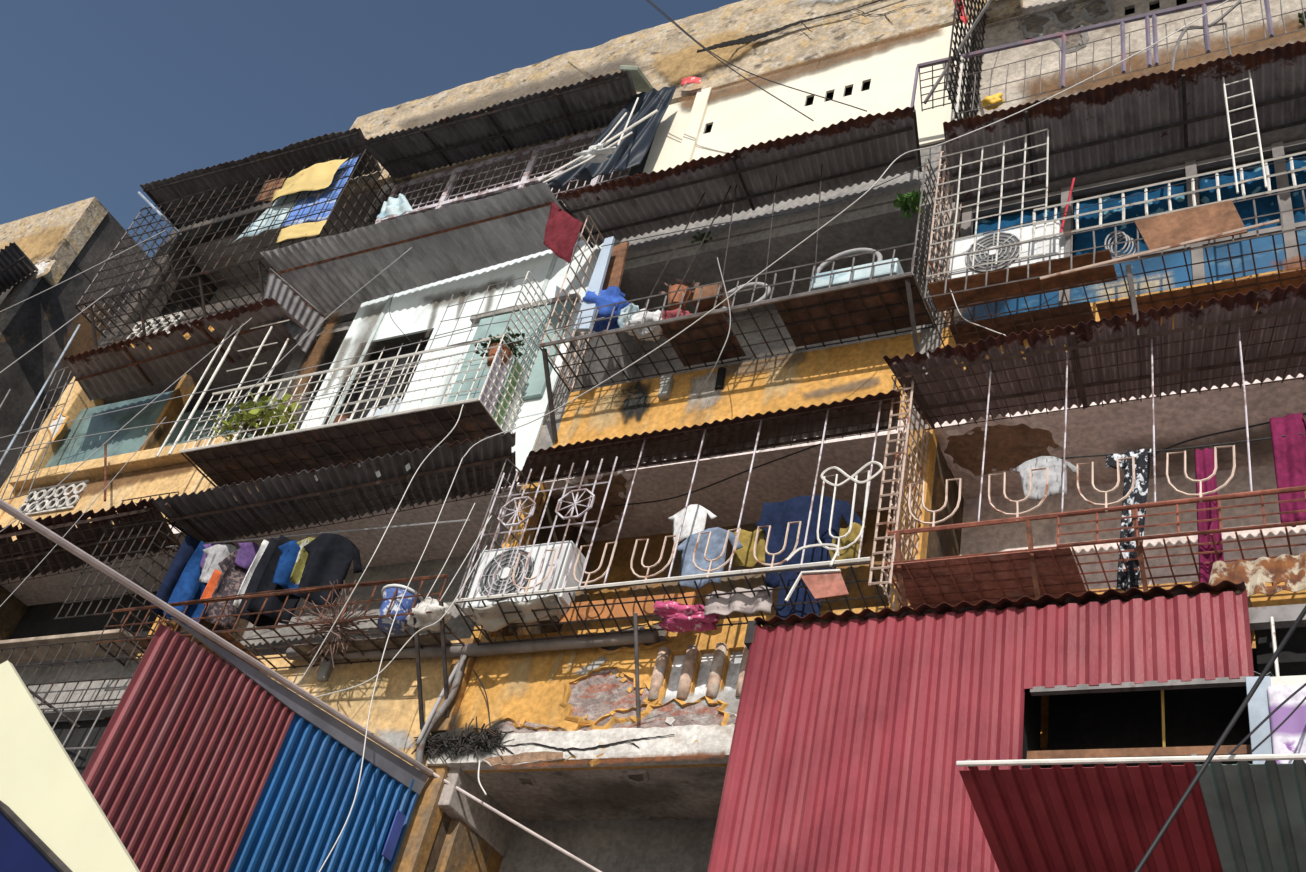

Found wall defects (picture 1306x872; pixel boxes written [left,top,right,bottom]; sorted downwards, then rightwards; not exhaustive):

crack [697,0,929,58]
flaking render [938,415,1071,481]
flaking render [486,621,730,743]
peeling [481,751,605,767]